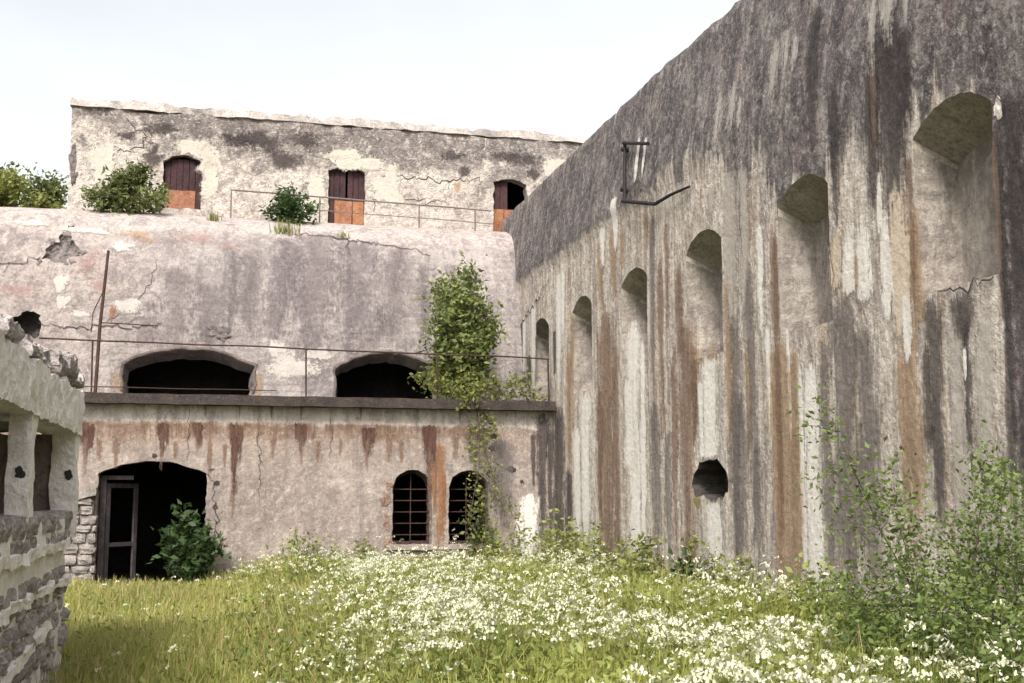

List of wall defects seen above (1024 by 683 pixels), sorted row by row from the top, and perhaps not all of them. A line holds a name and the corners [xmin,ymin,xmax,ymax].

efflorescence [767,30,799,112]
water stain [867,0,908,76]
water stain [711,82,744,151]
hole [13,311,41,339]
spalling [36,226,90,317]
crack [38,261,162,330]
crack [286,232,430,256]
crack [937,276,994,316]
rust [80,423,95,458]
rust [157,422,170,456]
rust [229,423,243,492]
rust [362,427,376,454]